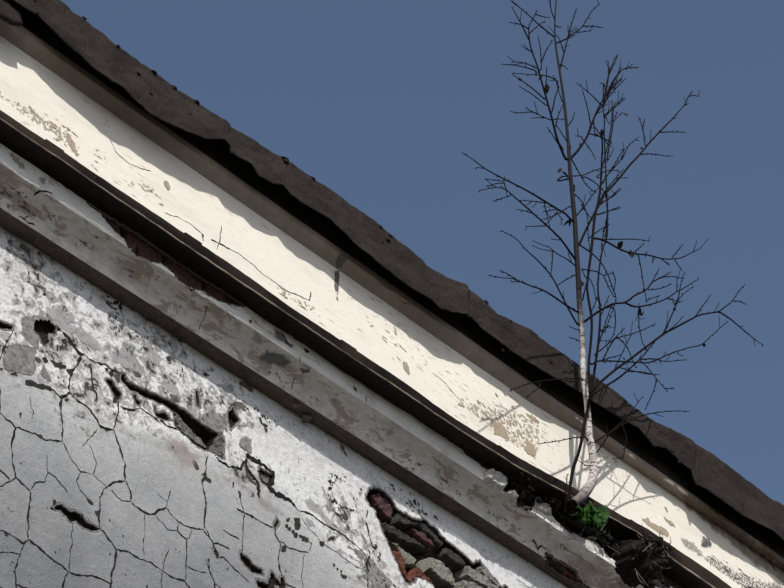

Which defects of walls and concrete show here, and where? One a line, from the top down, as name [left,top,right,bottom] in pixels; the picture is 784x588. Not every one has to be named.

peeling [0,91,79,156]
crack [167,213,311,301]
peeling [0,309,102,391]
spalling [105,294,278,461]
spalling [42,498,101,533]
crack [0,325,373,588]
spalling [258,466,273,487]
spalling [273,472,508,588]
peeling [458,398,539,456]